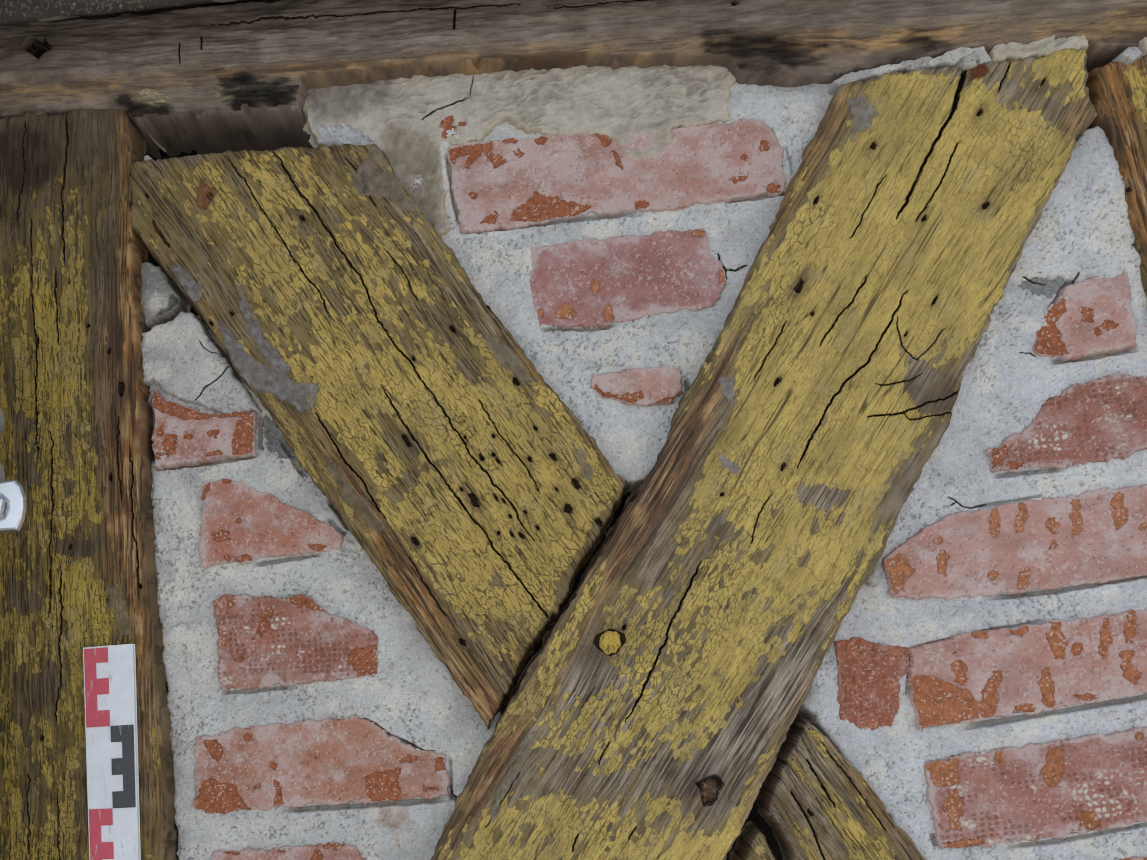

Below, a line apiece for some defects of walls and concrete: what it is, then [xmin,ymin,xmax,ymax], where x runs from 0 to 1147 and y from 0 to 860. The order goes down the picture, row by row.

crack [178,3,521,63]
spalling [439,115,524,169]
spalling [480,191,591,224]
crack [896,70,967,221]
crack [17,113,69,723]
spalling [153,391,296,463]
crack [273,152,539,541]
crack [797,290,959,469]
spalling [1018,276,1119,357]
crack [383,388,549,619]
peeling [504,690,783,816]
spalling [909,651,1003,729]